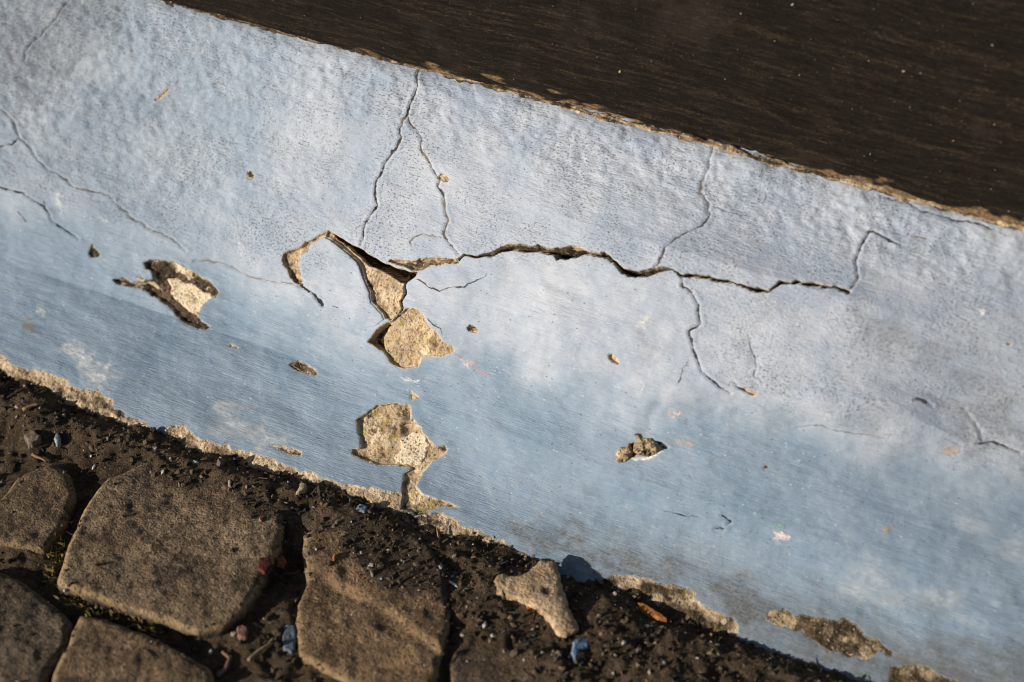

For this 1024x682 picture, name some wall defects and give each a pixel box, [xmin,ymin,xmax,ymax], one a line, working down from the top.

crack [0,187,76,237]
crack [96,192,178,244]
crack [361,70,995,396]
spalling [113,259,219,330]
spalling [281,230,456,369]
spalling [287,360,317,376]
spalling [164,389,528,557]
spalling [615,433,667,463]
peeling [601,574,739,637]
peeling [766,608,957,682]